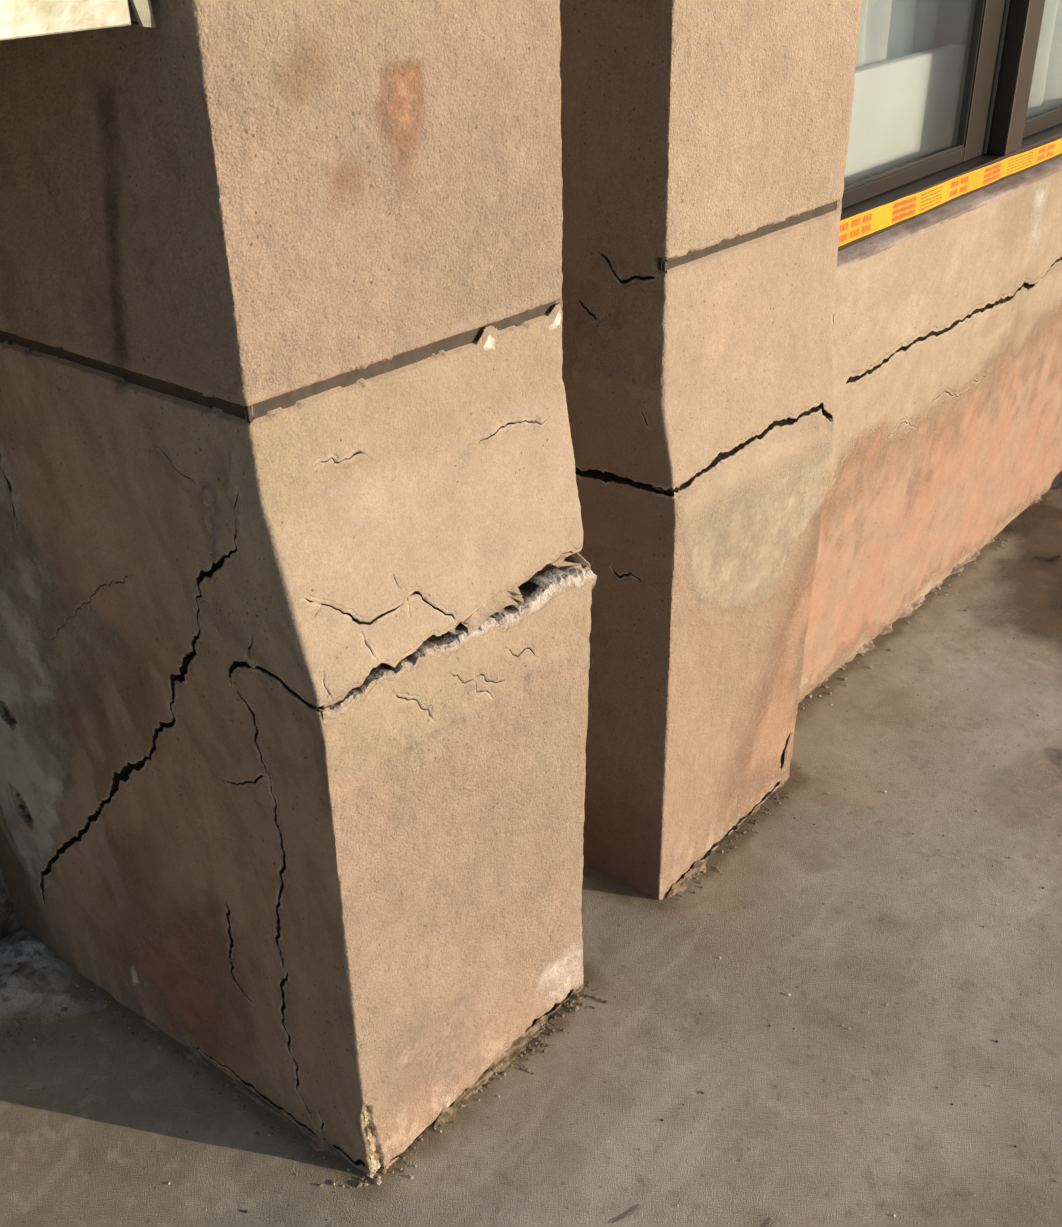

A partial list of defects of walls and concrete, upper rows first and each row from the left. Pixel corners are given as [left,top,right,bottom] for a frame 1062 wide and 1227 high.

crack [595,249,658,287]
crack [312,445,368,471]
crack [475,414,550,452]
crack [575,255,1062,501]
damp [726,309,1062,800]
spalling [313,566,597,722]
crack [38,485,645,1172]